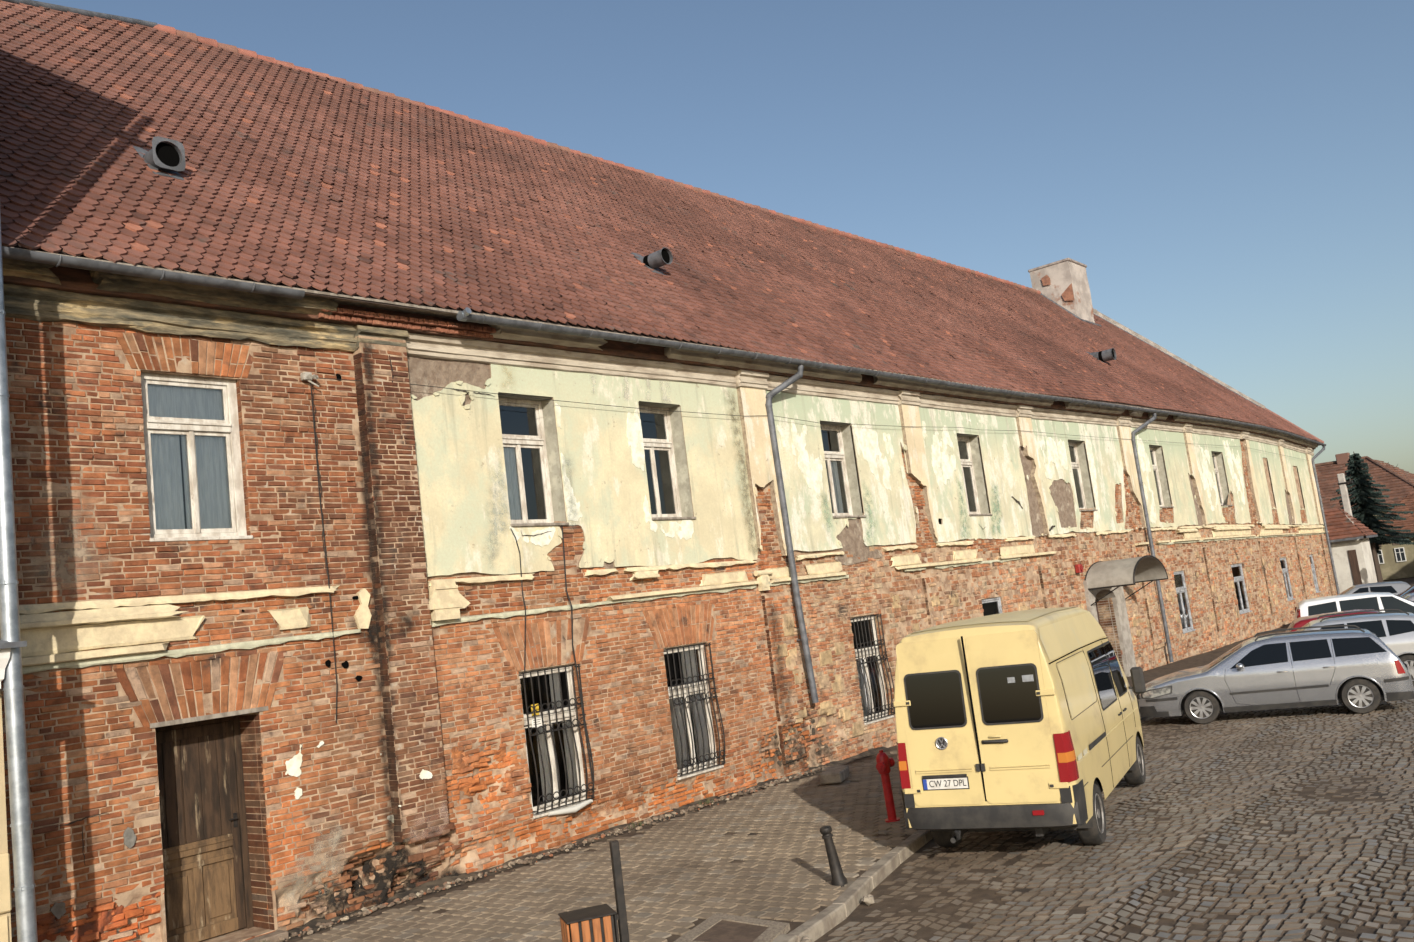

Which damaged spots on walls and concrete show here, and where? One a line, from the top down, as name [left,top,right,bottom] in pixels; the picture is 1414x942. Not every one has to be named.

spalling [407,356,491,409]
spalling [509,453,587,597]
spalling [753,482,786,569]
spalling [834,518,883,565]
peeling [854,419,981,553]
spalling [1019,427,1173,537]
spalling [37,892,161,942]
leakage [284,837,460,919]